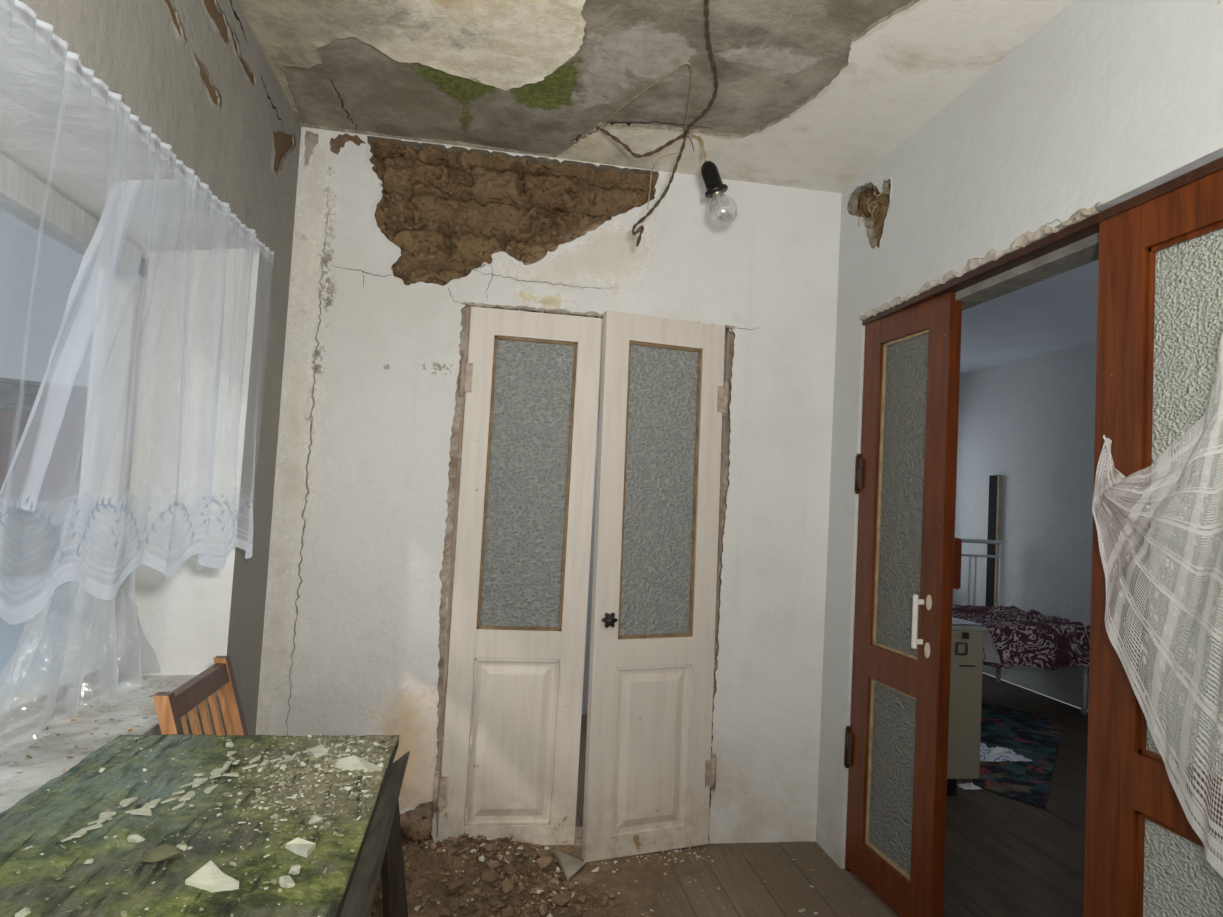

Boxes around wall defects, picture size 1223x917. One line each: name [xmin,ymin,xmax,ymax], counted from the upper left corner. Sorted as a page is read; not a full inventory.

peeling [162,0,222,115]
peeling [200,0,256,87]
peeling [270,0,929,291]
crack [286,192,388,736]
flaking render [435,301,603,771]
flaking render [691,321,735,756]